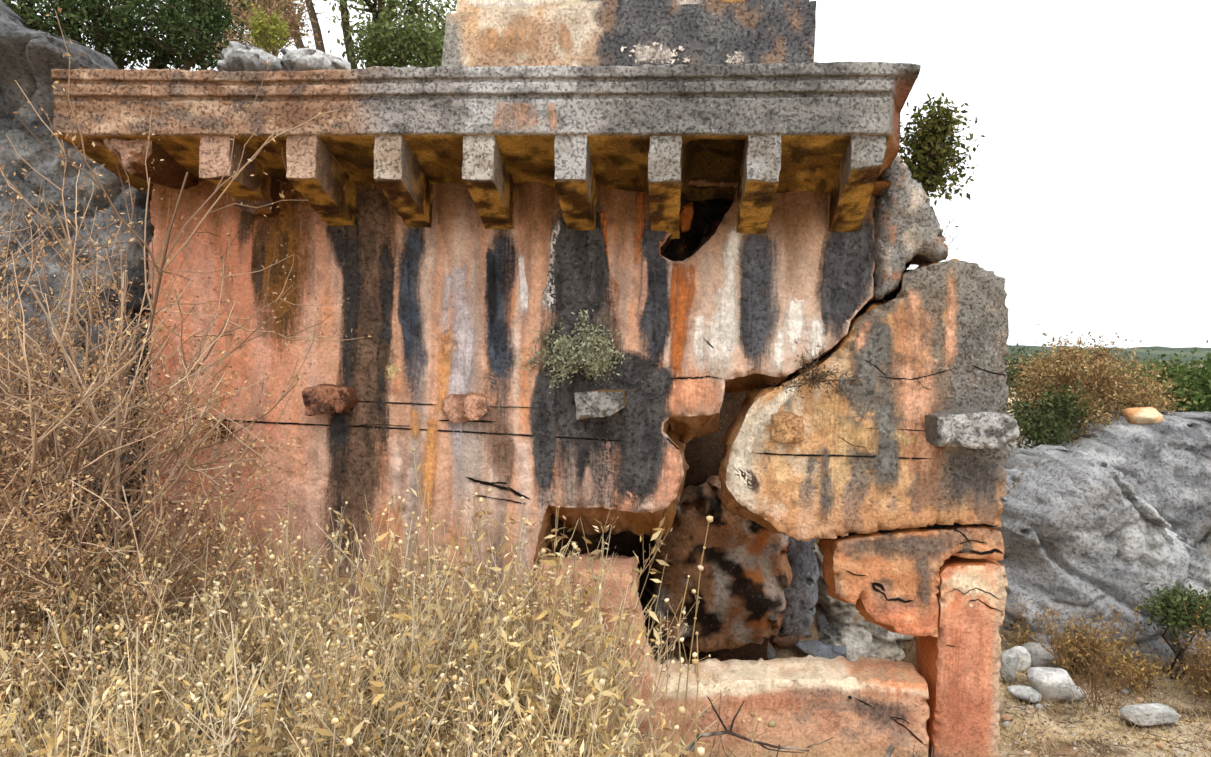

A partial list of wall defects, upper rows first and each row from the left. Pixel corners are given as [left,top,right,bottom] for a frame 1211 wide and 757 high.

peeling [680,201,694,234]
crack [854,255,916,318]
crack [774,344,837,384]
crack [864,359,1005,390]
rust [411,332,451,512]
crack [757,428,930,460]
spalling [736,468,759,491]
crack [822,523,1003,555]
crack [846,571,914,603]
crack [947,588,1002,612]